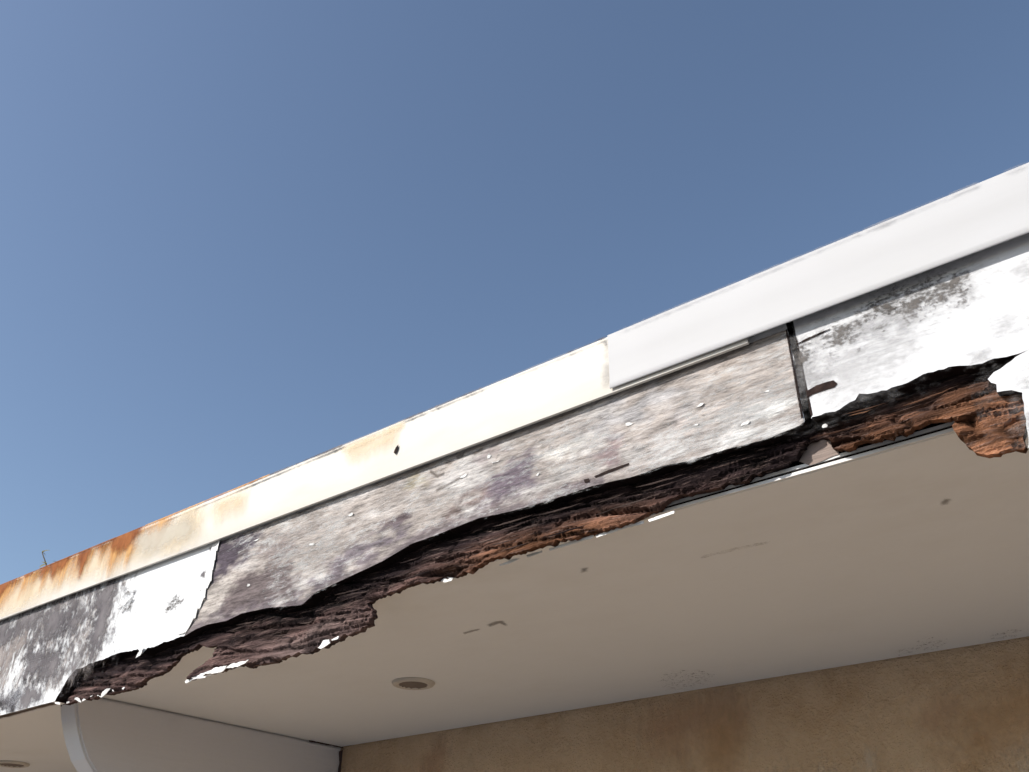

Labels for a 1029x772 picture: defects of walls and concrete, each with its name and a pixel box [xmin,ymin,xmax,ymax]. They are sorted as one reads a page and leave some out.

leakage [821,271,969,347]
peeling [177,330,804,635]
corrosion [0,516,170,603]
leakage [0,574,136,712]
peeling [185,660,249,684]